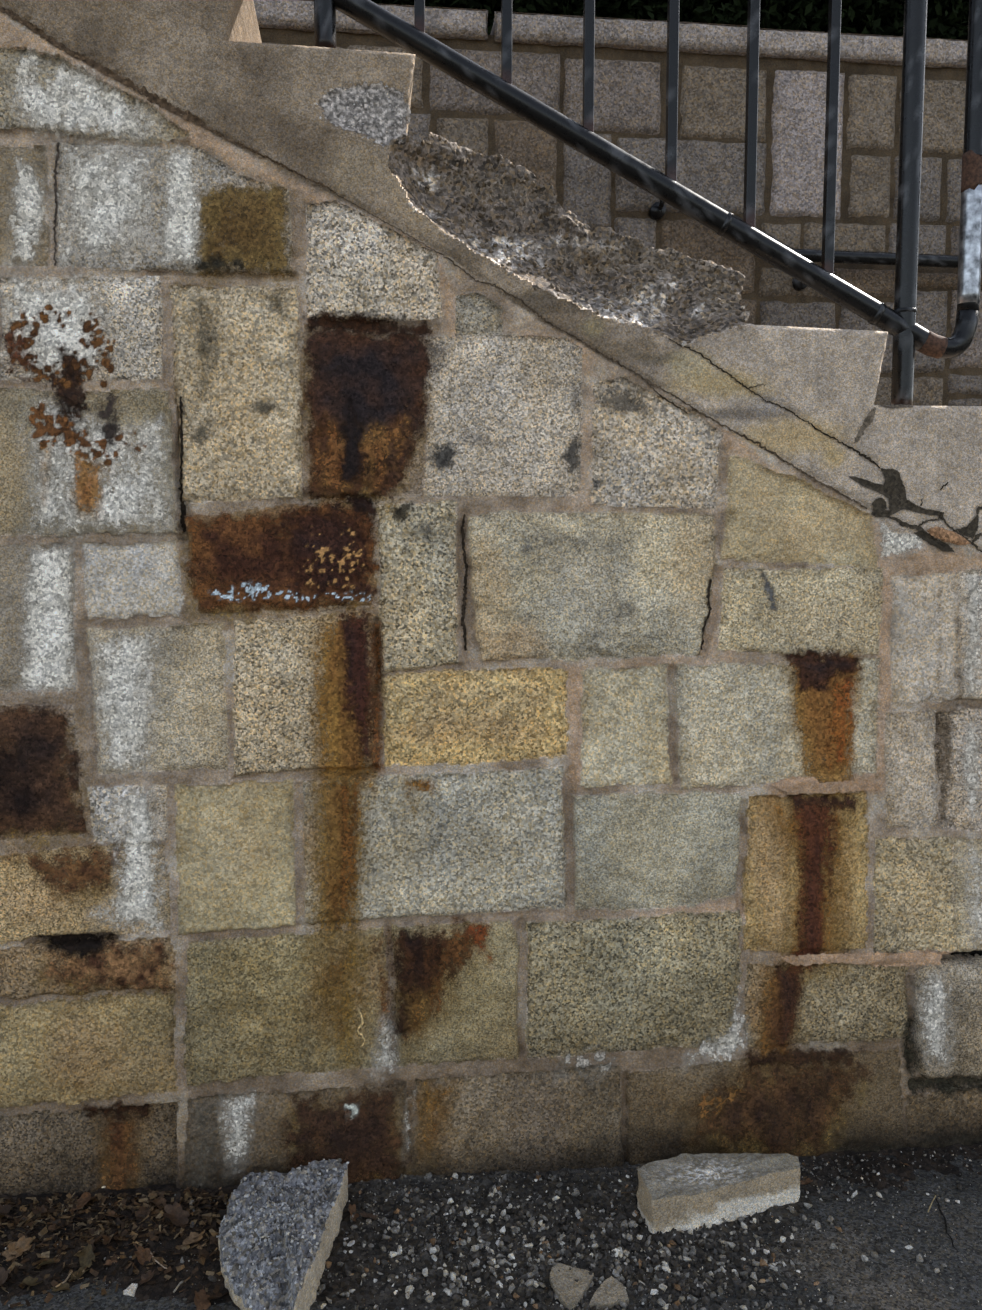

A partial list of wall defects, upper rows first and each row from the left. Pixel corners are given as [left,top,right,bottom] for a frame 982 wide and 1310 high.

rust [4,304,147,513]
crack [0,6,982,552]
spalling [314,81,747,347]
rust [0,706,123,901]
rust [38,932,176,996]
rust [180,311,491,1068]
rust [690,647,872,1156]